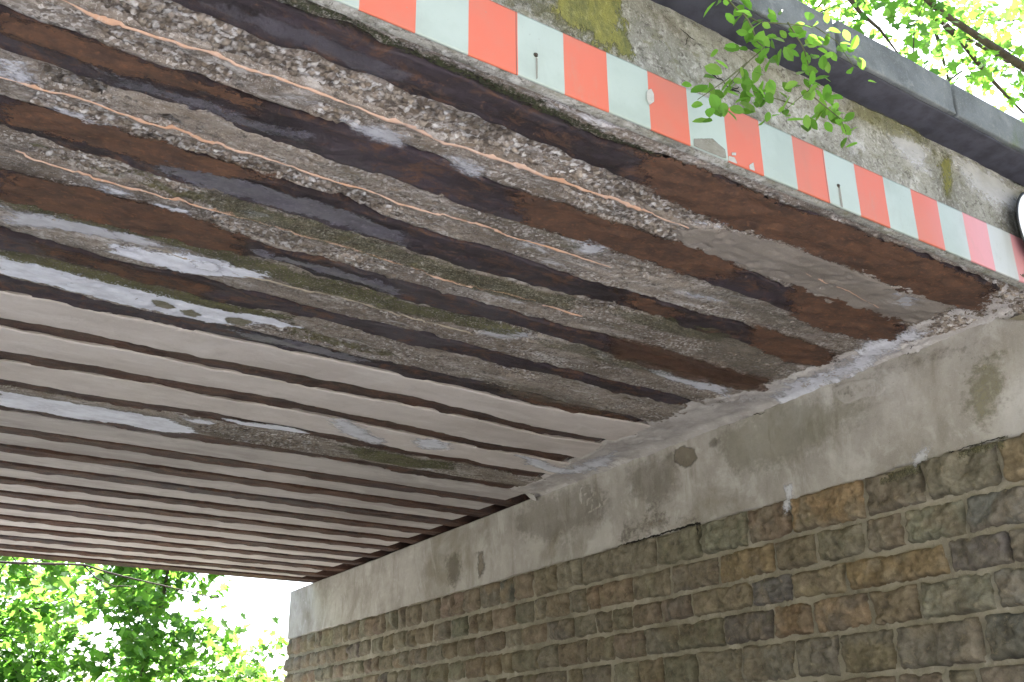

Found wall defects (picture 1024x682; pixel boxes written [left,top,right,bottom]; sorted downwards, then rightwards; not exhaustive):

rust [0,169,250,256]
rust [0,98,277,181]
damp [6,212,276,279]
peeling [29,63,410,296]
spalling [93,0,721,242]
rust [499,182,747,285]
rust [628,151,996,315]
damp [0,256,303,329]
spalling [226,322,396,363]
damp [769,329,927,404]
damp [0,391,309,434]
crack [618,522,701,547]